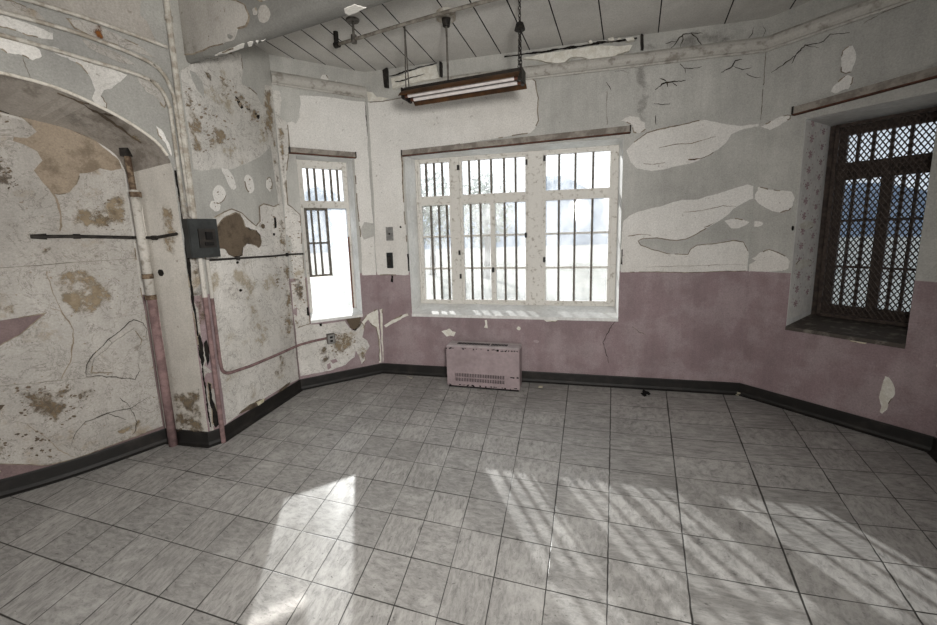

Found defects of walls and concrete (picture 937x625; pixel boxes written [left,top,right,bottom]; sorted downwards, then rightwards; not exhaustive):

peeling [0,15,127,108]
crack [655,32,702,124]
crack [723,2,910,119]
peeling [156,126,176,170]
peeling [621,115,791,171]
peeling [178,0,539,431]
peeling [621,184,795,273]
peeling [0,115,163,472]
crack [3,258,147,457]
peeling [879,376,895,413]